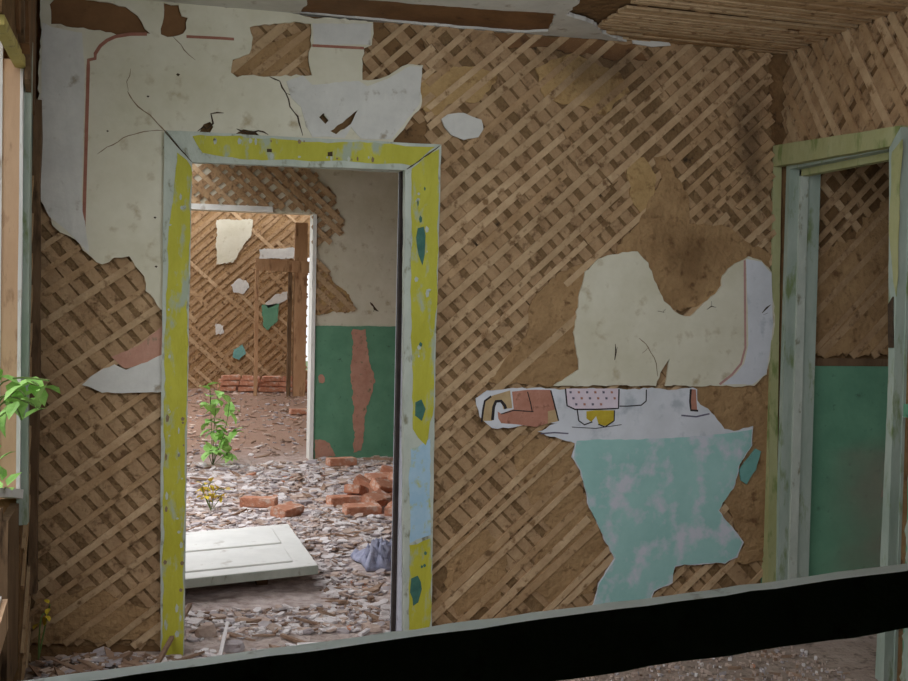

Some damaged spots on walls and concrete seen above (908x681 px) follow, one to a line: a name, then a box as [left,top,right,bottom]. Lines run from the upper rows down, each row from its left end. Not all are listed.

peeling [15,0,37,115]
crack [99,69,166,153]
crack [270,77,324,135]
peeling [20,0,423,681]
spalling [148,0,908,626]
peeling [899,628,908,681]